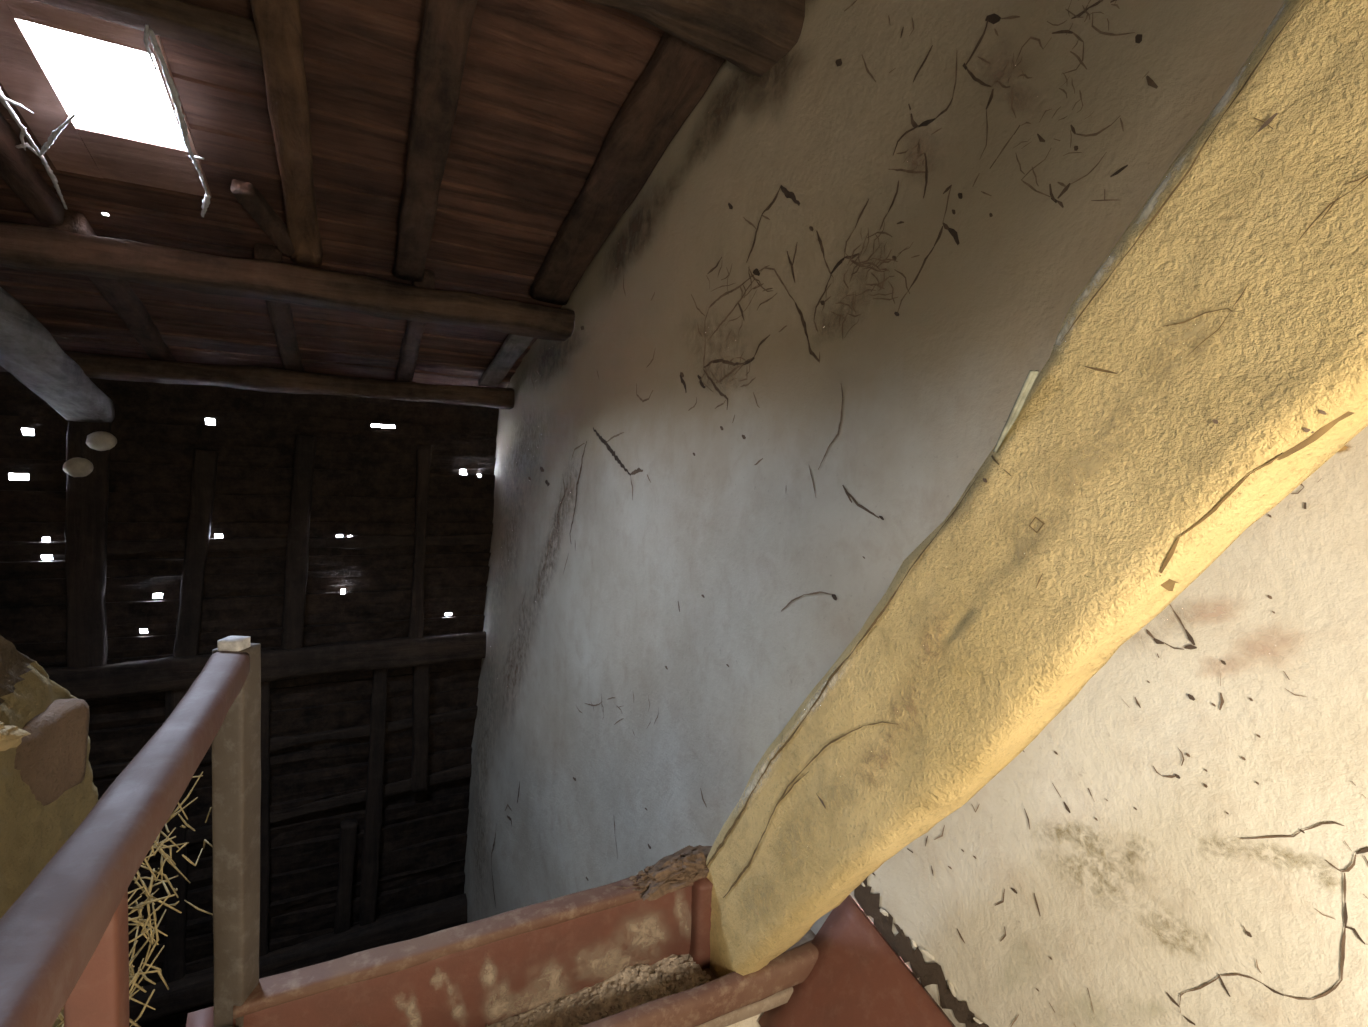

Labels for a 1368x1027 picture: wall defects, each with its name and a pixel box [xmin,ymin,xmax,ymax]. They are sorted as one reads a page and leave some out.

crack [636,0,1158,520]
crack [522,428,651,616]
crack [577,666,668,736]
crack [700,477,978,898]
crack [1126,410,1354,710]
spalling [854,877,989,1027]
crack [995,888,1040,942]
crack [1153,748,1368,1025]